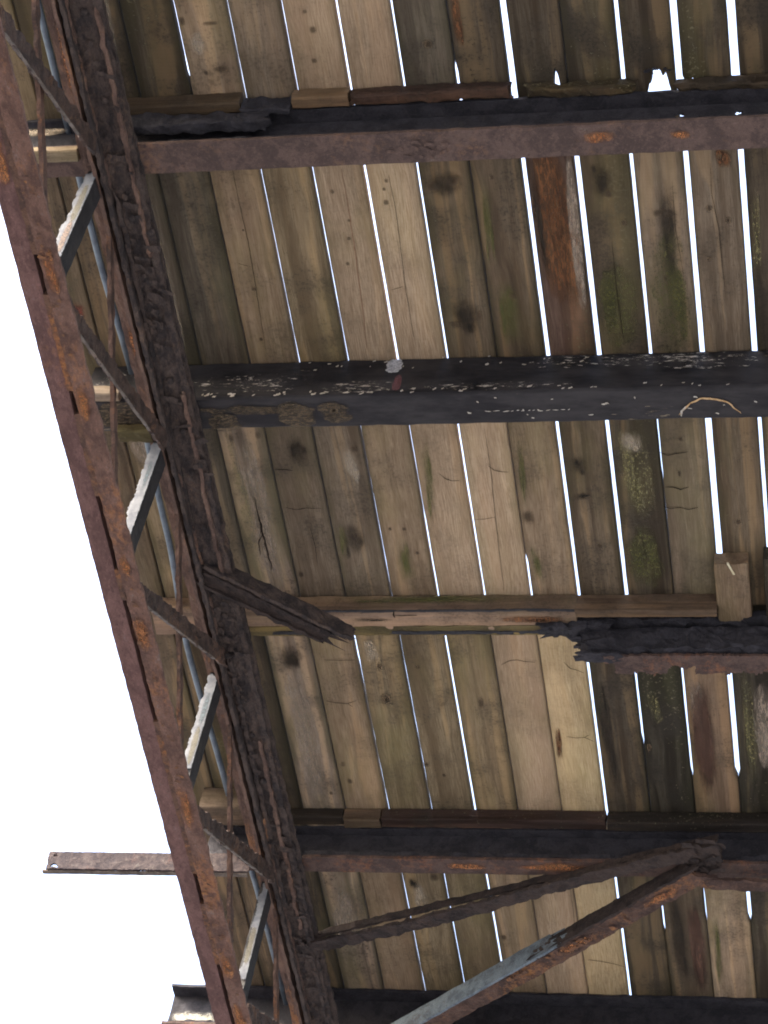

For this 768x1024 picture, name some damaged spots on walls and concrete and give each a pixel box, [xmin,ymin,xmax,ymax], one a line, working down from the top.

corrosion [533,157,582,304]
damp [662,201,674,272]
crack [254,498,272,570]